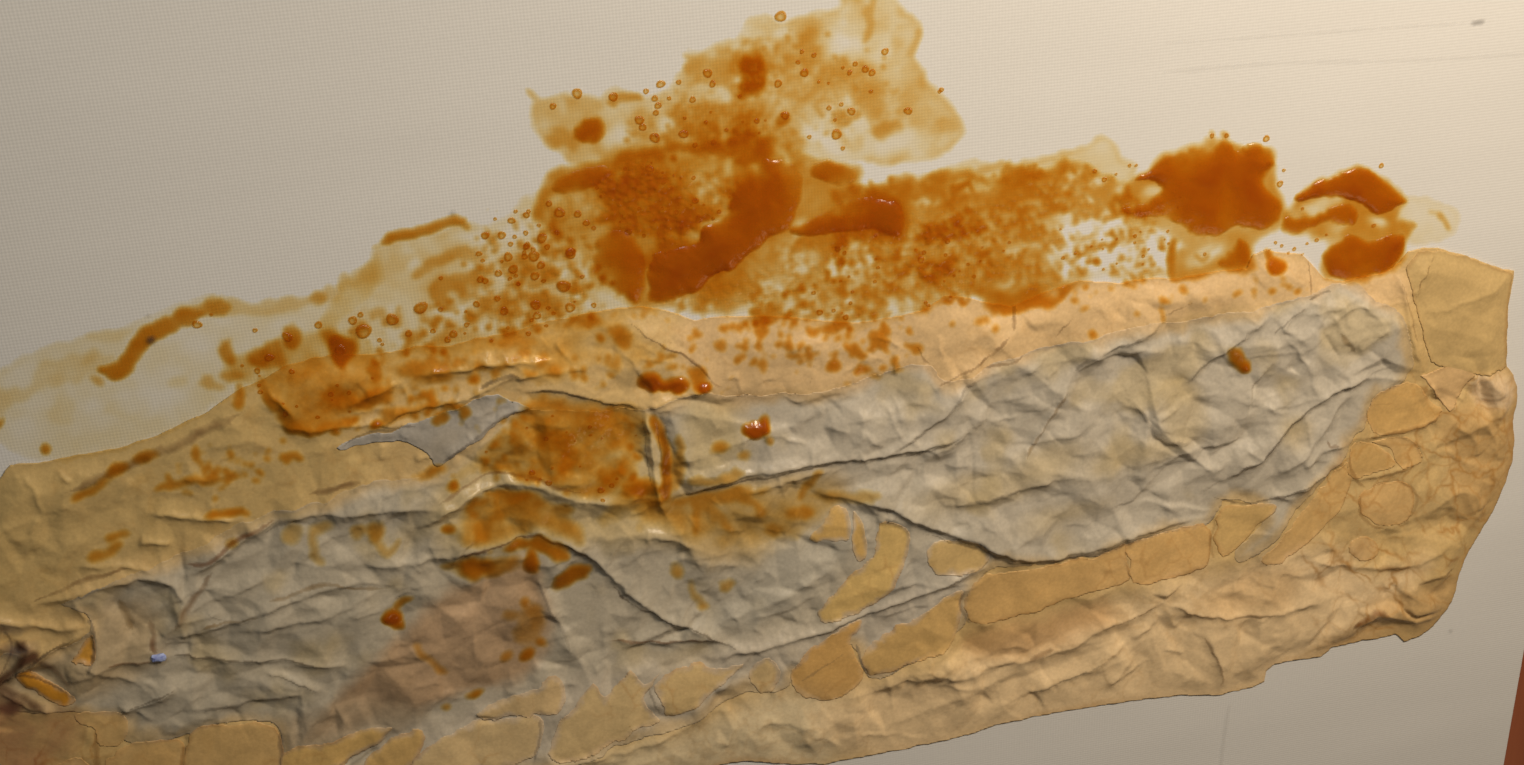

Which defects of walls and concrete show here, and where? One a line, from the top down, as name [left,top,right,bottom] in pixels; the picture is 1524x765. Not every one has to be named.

corrosion [642,375,709,392]
corrosion [744,419,769,438]